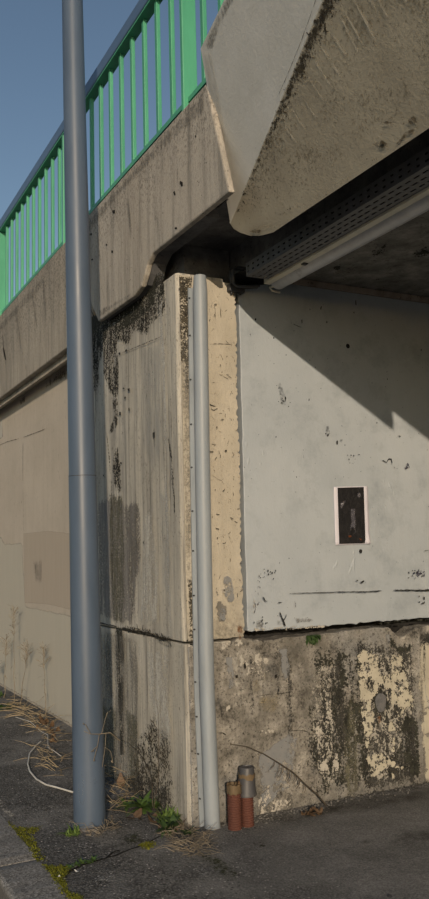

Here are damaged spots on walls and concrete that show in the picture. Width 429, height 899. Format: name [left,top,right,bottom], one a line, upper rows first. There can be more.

leakage [92,273,165,496]
leakage [179,276,192,437]
leakage [305,641,429,810]
peeling [357,633,429,783]